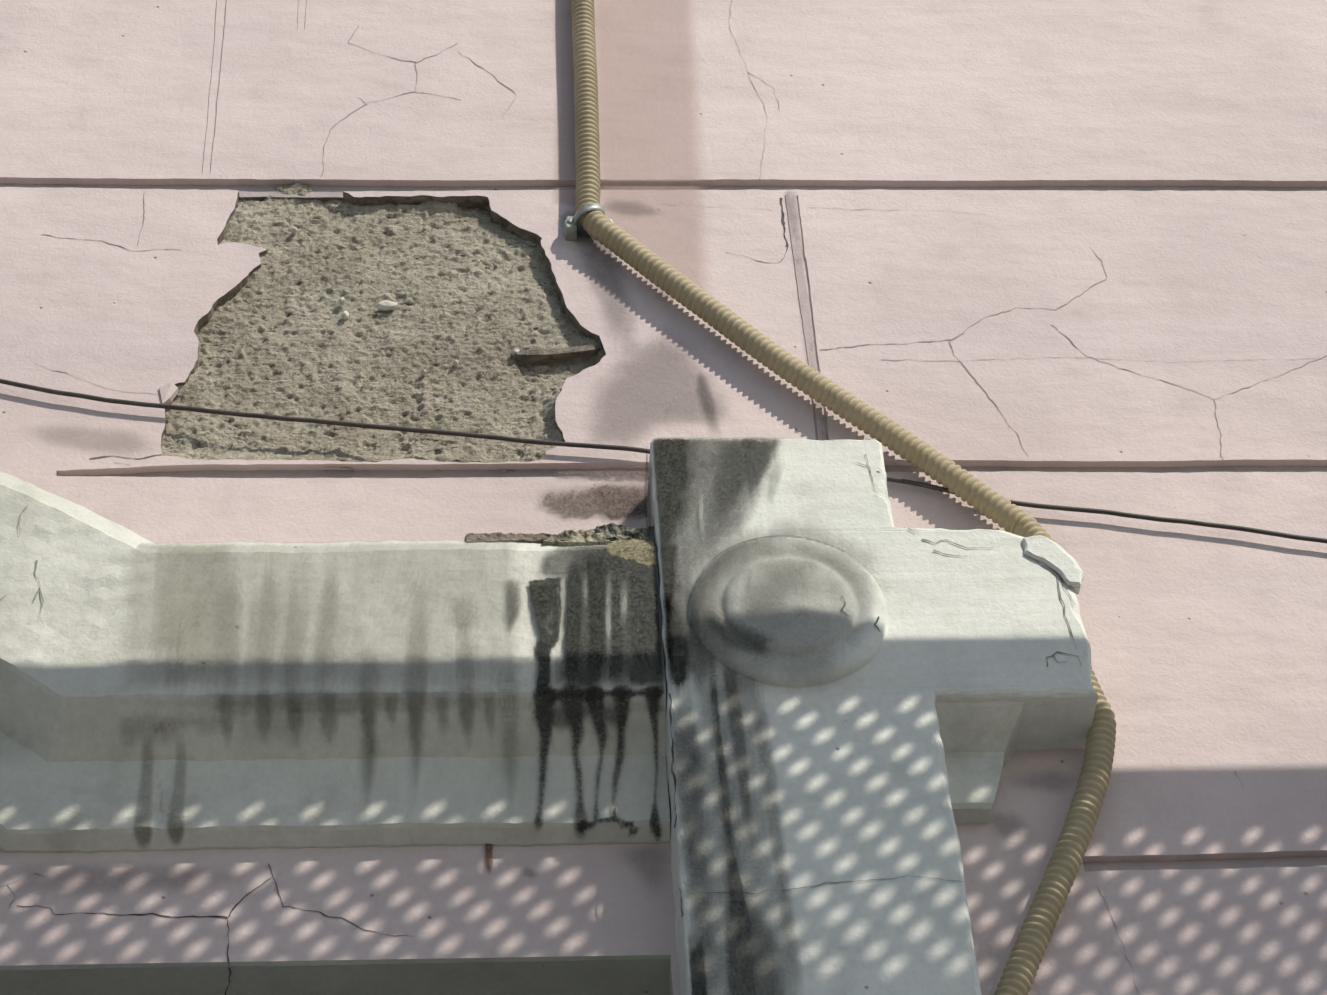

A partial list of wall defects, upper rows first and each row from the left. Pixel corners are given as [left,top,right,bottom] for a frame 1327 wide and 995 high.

crack [321,25,517,177]
spalling [159,182,606,472]
crack [820,251,1327,461]
spalling [464,523,655,546]
water stain [508,438,781,995]
crack [0,864,414,995]